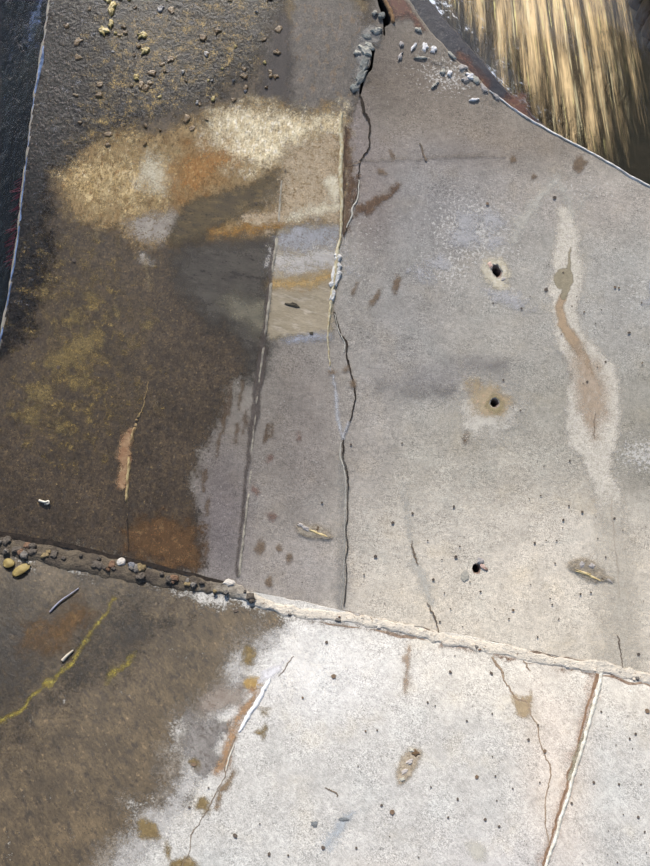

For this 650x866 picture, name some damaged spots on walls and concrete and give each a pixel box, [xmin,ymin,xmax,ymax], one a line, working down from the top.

peeling [350,10,385,93]
crack [343,0,395,237]
leakage [0,0,376,576]
crack [328,312,356,607]
leakage [0,555,414,866]
crack [491,657,552,846]